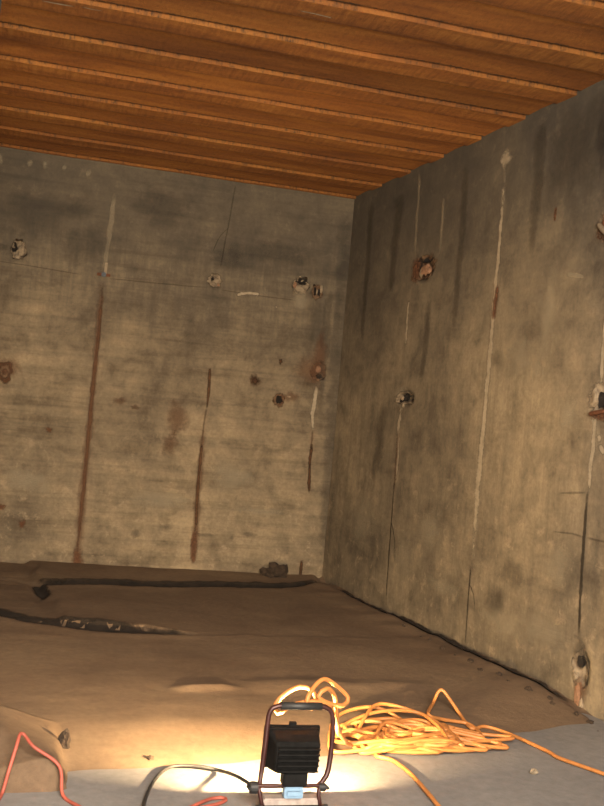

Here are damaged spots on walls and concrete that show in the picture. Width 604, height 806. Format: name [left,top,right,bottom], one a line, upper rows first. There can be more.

spalling [411,255,437,281]
spalling [292,276,323,300]
rust [0,361,13,384]
leakage [472,189,504,549]
spalling [395,391,414,407]
spalling [588,382,604,420]
rust [73,302,102,563]
rust [191,446,203,562]
crack [578,495,588,629]